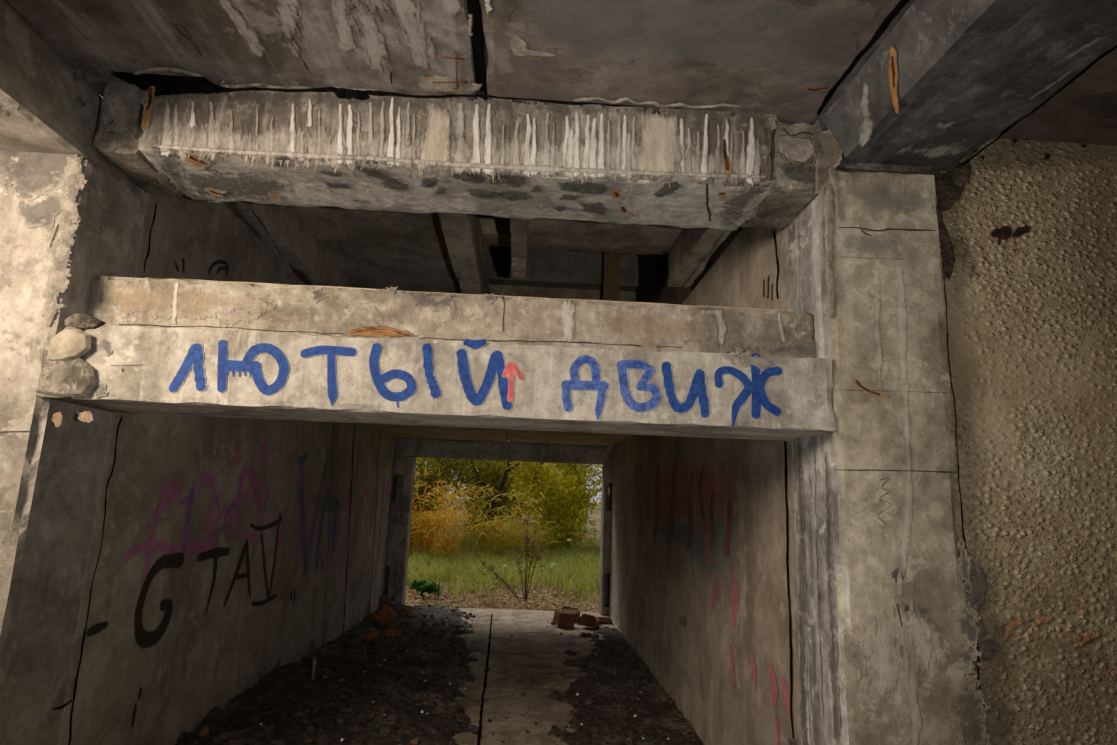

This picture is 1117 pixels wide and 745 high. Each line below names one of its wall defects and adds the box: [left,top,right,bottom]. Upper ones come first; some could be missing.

rust [141,86,155,130]
damp [152,97,781,230]
crack [108,0,910,182]
rust [715,139,734,201]
rust [888,46,899,114]
flaking render [935,149,985,280]
flaking render [990,225,1031,255]
spalling [101,339,112,357]
spalling [347,325,417,338]
crack [846,260,968,551]
crack [52,417,122,745]
crack [477,613,493,745]